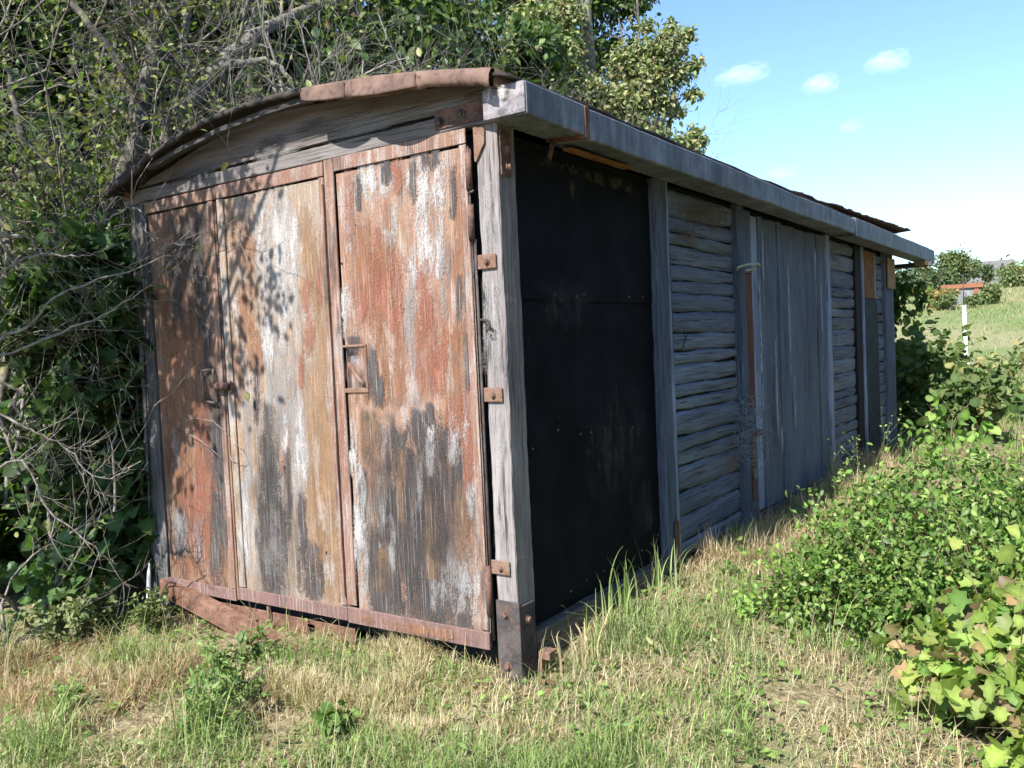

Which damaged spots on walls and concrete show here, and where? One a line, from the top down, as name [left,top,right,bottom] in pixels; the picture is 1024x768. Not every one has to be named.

corrosion [487,85,507,101]
peeling [341,164,397,265]
peeling [400,151,450,410]
peeling [255,190,309,498]
corrosion [344,158,473,559]
corrosion [161,256,217,574]
peeling [242,397,286,575]
peeling [417,425,436,510]
peeling [448,414,470,465]
corrosion [384,620,465,640]
corrosion [423,494,440,580]
peeling [431,550,480,615]